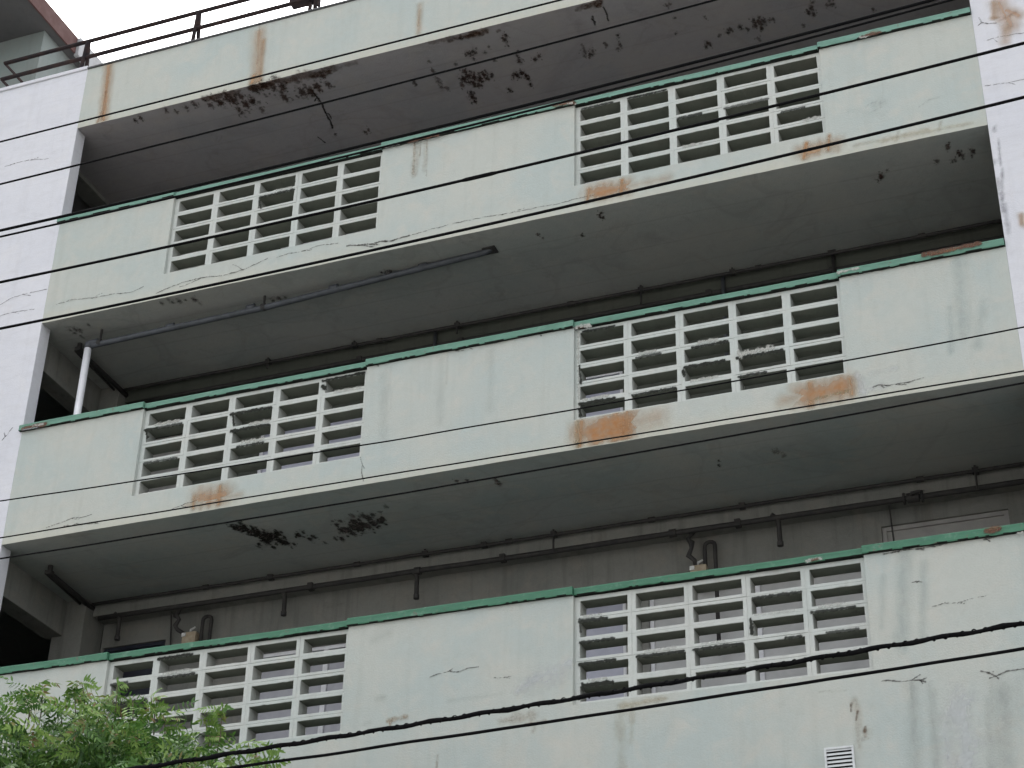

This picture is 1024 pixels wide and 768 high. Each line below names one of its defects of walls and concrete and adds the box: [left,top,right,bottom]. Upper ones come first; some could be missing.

rust [102,64,110,121]
peeling [165,72,332,114]
peeling [458,50,493,104]
peeling [501,34,532,93]
rust [796,377,853,405]
rust [575,411,637,448]
peeling [226,521,316,549]
peeling [332,513,387,541]